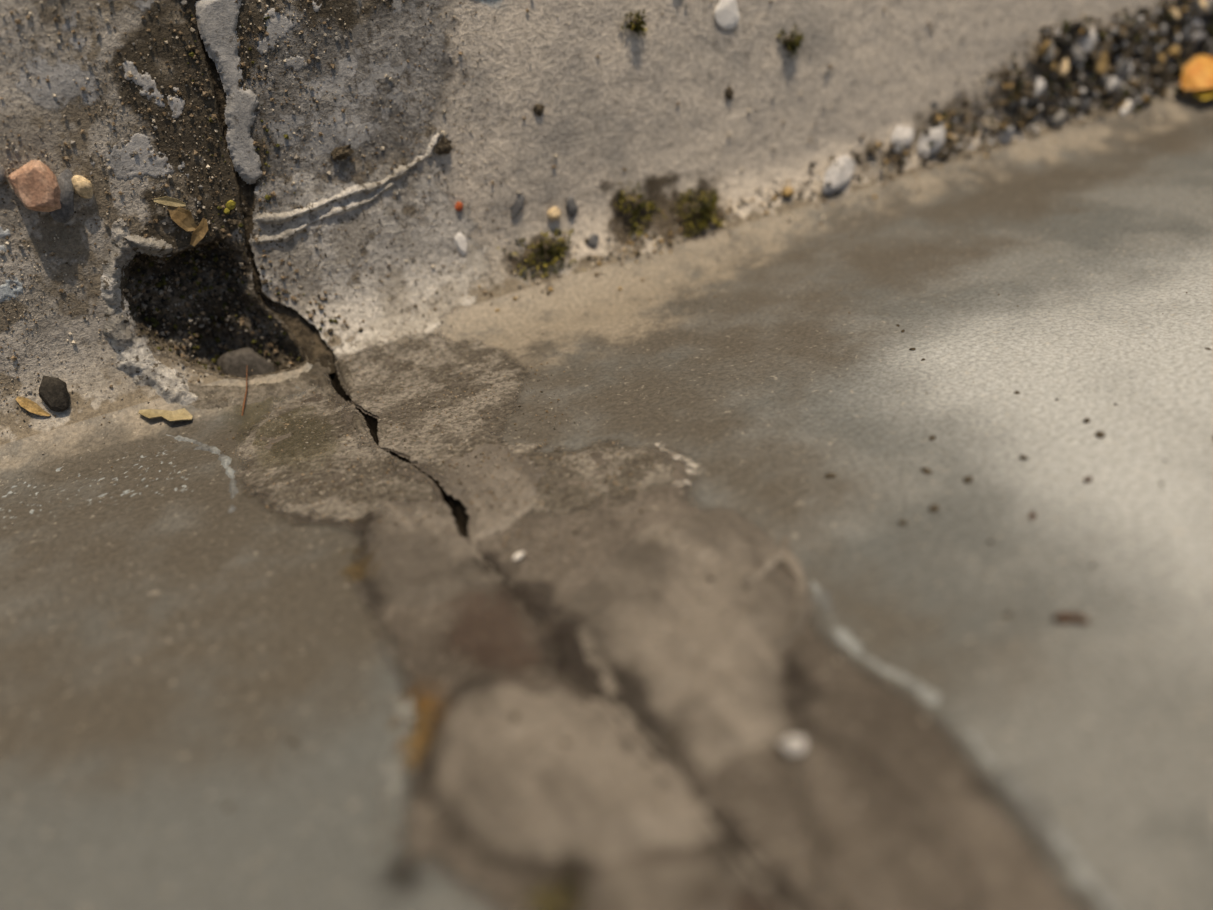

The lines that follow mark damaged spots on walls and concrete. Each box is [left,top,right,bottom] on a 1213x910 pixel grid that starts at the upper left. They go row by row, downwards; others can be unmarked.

peeling [135,0,154,11]
peeling [15,10,98,109]
peeling [123,61,185,118]
peeling [195,0,419,184]
peeling [90,133,189,181]
spalling [120,234,309,381]
crack [194,0,545,629]
peeling [318,361,355,401]
peeling [352,414,388,442]